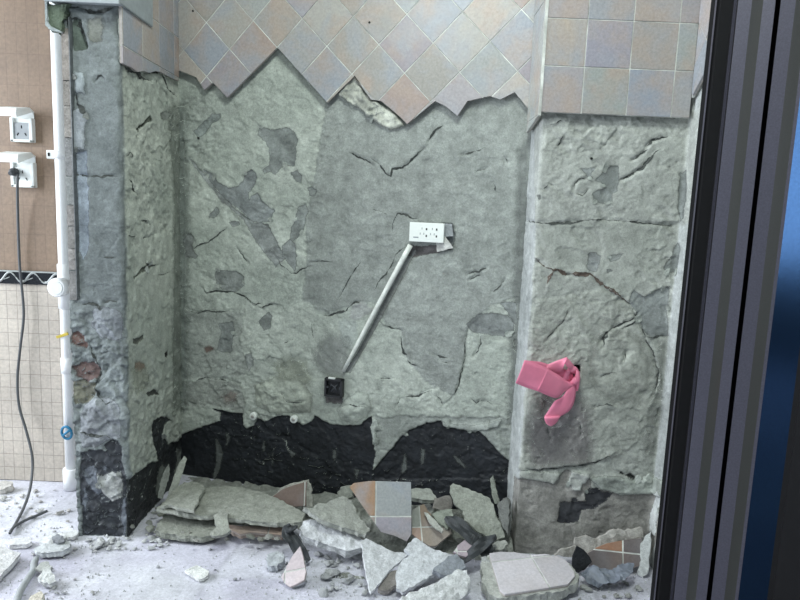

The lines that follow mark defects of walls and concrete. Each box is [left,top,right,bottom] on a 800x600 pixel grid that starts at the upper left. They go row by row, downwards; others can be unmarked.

spalling [339,78,404,130]
crack [352,126,442,177]
crack [623,136,666,179]
flaking render [204,123,317,271]
crack [532,218,669,226]
flaking render [409,245,440,257]
crack [191,290,272,313]
flaking render [467,302,518,338]
crack [538,261,668,389]
crack [397,335,491,404]
flaking render [95,471,123,501]
flaking render [511,469,662,556]